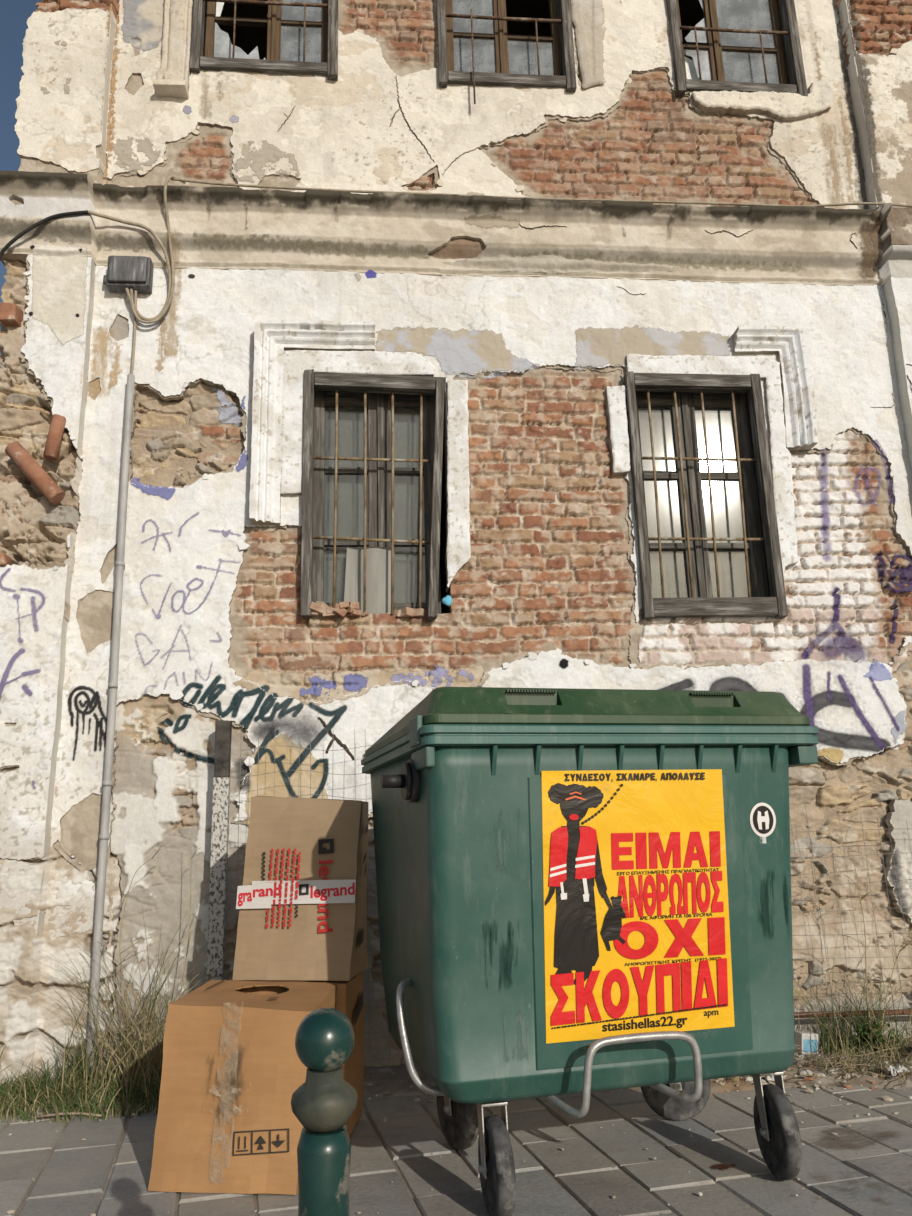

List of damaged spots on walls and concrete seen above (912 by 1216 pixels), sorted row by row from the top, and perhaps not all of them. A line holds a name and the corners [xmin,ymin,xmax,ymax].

peeling [41,69,71,94]
peeling [35,0,164,56]
spalling [18,105,301,205]
spalling [338,0,438,77]
crack [389,76,482,175]
spalling [478,68,818,207]
spalling [837,0,912,68]
spalling [429,215,519,259]
spalling [0,243,88,573]
spalling [129,379,248,500]
spalling [228,325,912,1068]
spalling [0,692,328,1089]